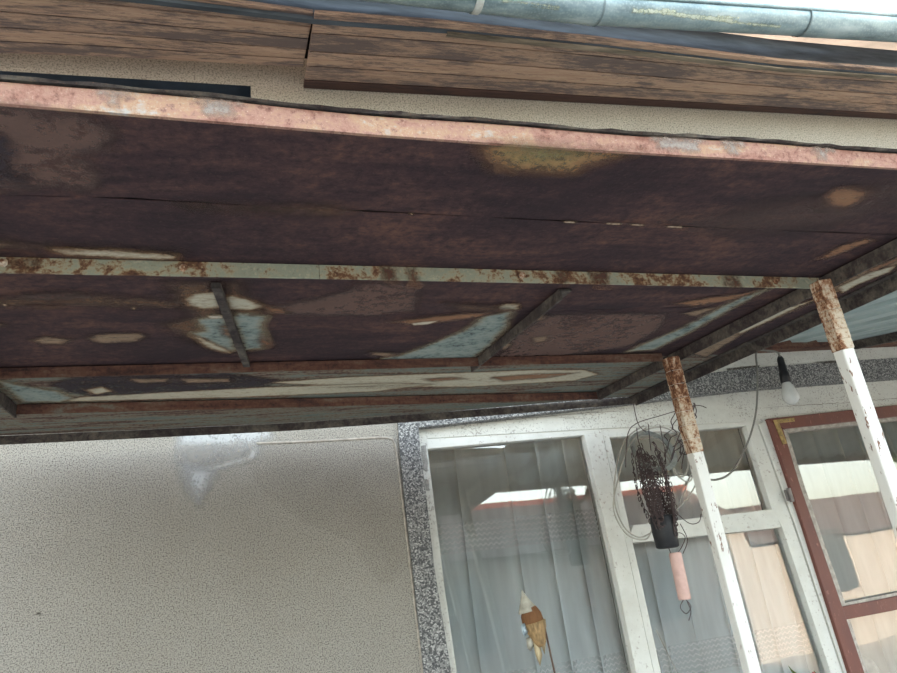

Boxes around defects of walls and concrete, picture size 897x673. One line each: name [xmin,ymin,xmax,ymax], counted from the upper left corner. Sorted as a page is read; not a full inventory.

corrosion [0,105,117,191]
corrosion [481,143,626,174]
peeling [163,282,273,353]
corrosion [263,265,426,316]
peeling [370,304,520,360]
peeling [0,369,599,403]